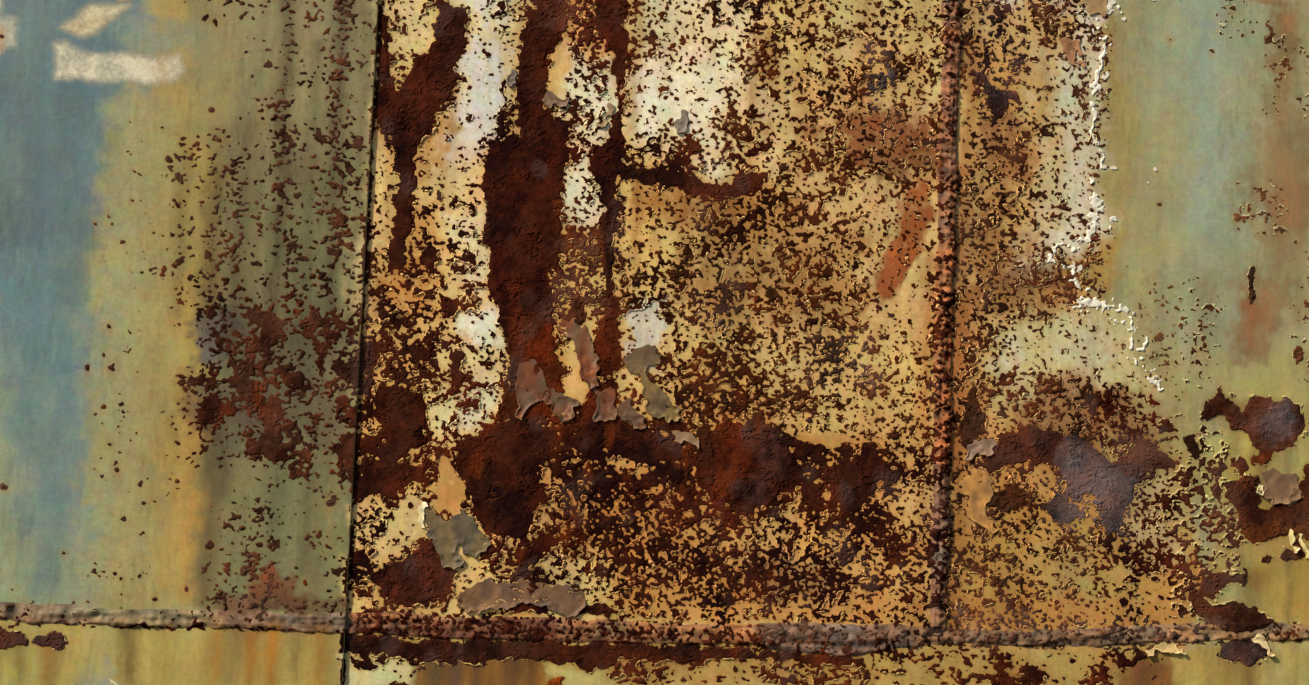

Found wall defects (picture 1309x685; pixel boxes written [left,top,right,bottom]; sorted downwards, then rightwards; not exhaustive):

rust [202,0,270,26]
rust [1208,0,1309,119]
spalling [266,0,938,626]
spalling [952,0,1173,462]
rust [1127,275,1226,388]
rust [1233,179,1309,382]
rust [109,601,219,636]
rust [1023,555,1080,620]
spalling [944,438,1185,630]
peeling [1145,642,1187,657]
peeling [1185,588,1275,667]
peeling [1199,388,1309,563]